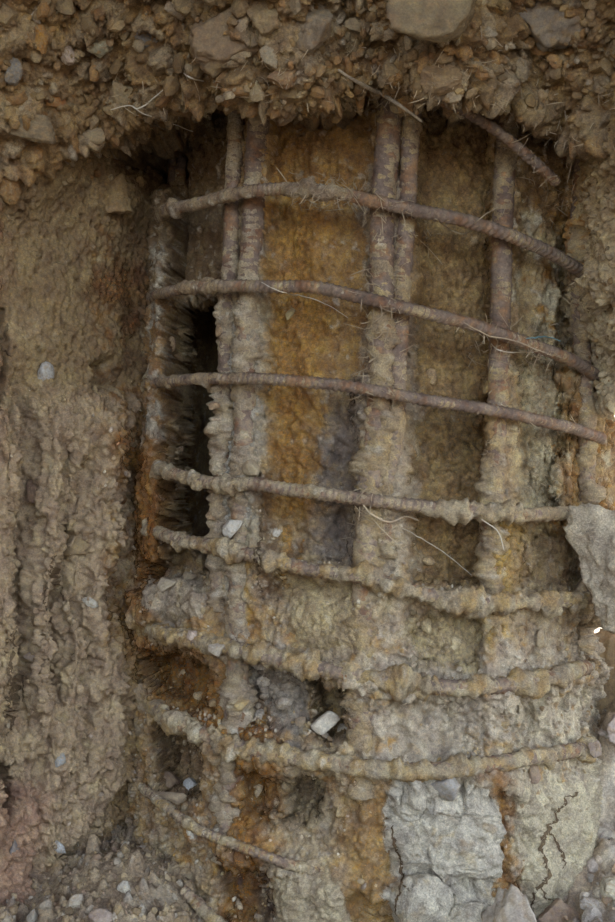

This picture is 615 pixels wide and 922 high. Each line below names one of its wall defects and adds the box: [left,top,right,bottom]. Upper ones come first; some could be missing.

rust [265,292,323,484]
spalling [414,317,489,403]
spalling [407,405,494,502]
rust [107,428,227,735]
spalling [411,513,482,587]
spalling [406,611,483,674]
spalling [157,732,204,803]
rust [238,712,282,743]
spalling [250,667,351,742]
rust [217,755,280,922]
rust [340,793,391,922]
crack [531,792,578,909]